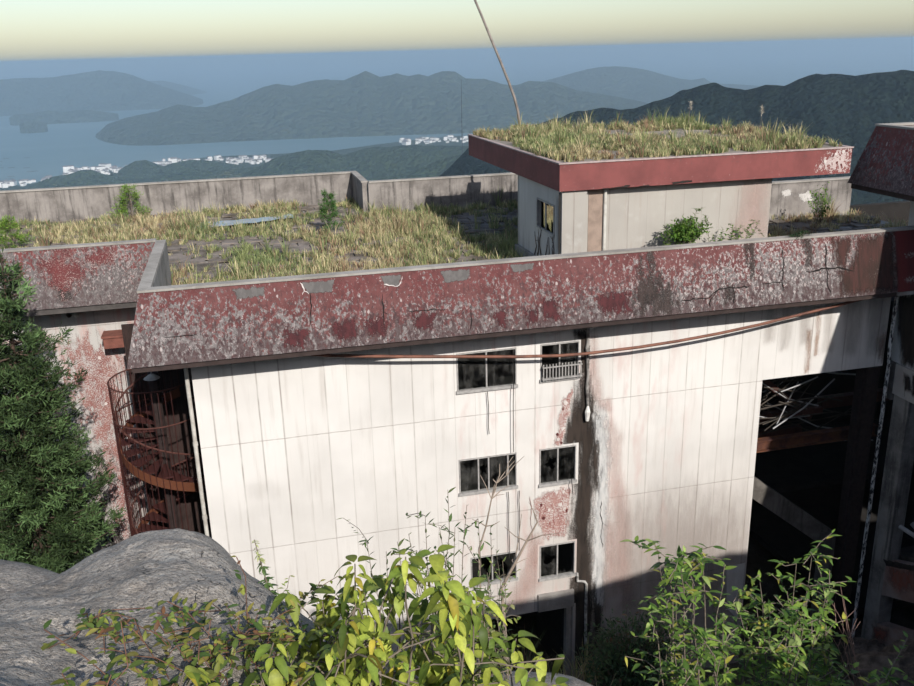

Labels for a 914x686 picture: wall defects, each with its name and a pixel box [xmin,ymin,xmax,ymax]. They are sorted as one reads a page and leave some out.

damp [563,329,612,668]